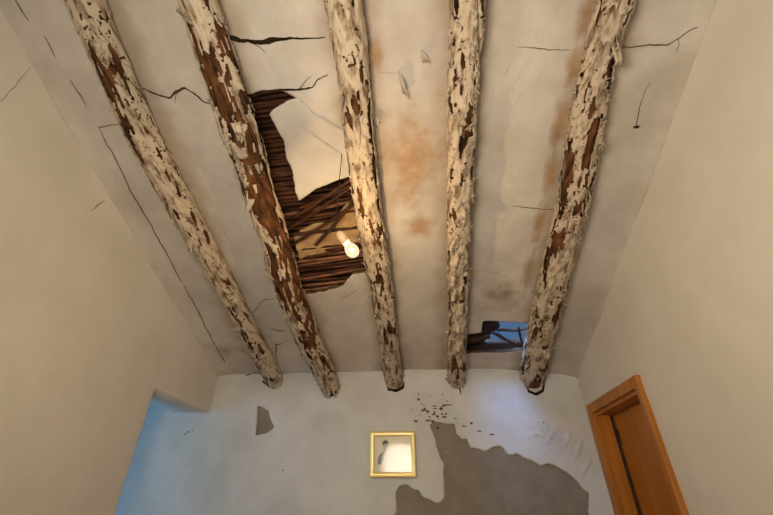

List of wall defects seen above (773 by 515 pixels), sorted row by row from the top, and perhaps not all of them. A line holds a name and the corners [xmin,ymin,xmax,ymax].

crack [142,87,210,104]
crack [227,34,325,54]
crack [622,27,698,52]
crack [98,124,225,362]
peeling [176,0,341,399]
peeling [445,0,486,389]
spalling [256,406,274,435]
spalling [395,393,589,515]